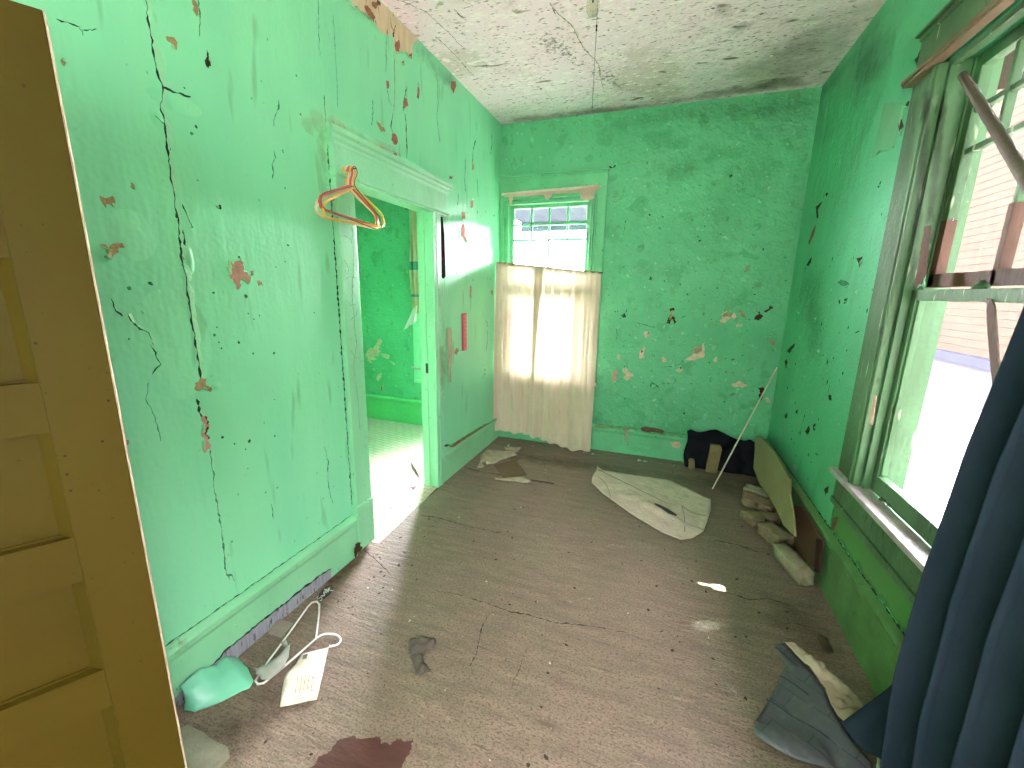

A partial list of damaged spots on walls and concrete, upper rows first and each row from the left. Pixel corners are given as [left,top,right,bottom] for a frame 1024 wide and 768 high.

spalling [347,0,419,66]
peeling [100,196,115,207]
crack [146,0,208,417]
peeling [100,243,125,260]
peeling [227,256,263,298]
crack [111,299,161,441]
spalling [195,378,212,392]
peeling [365,338,395,365]
peeling [601,331,771,449]
crack [438,591,641,665]